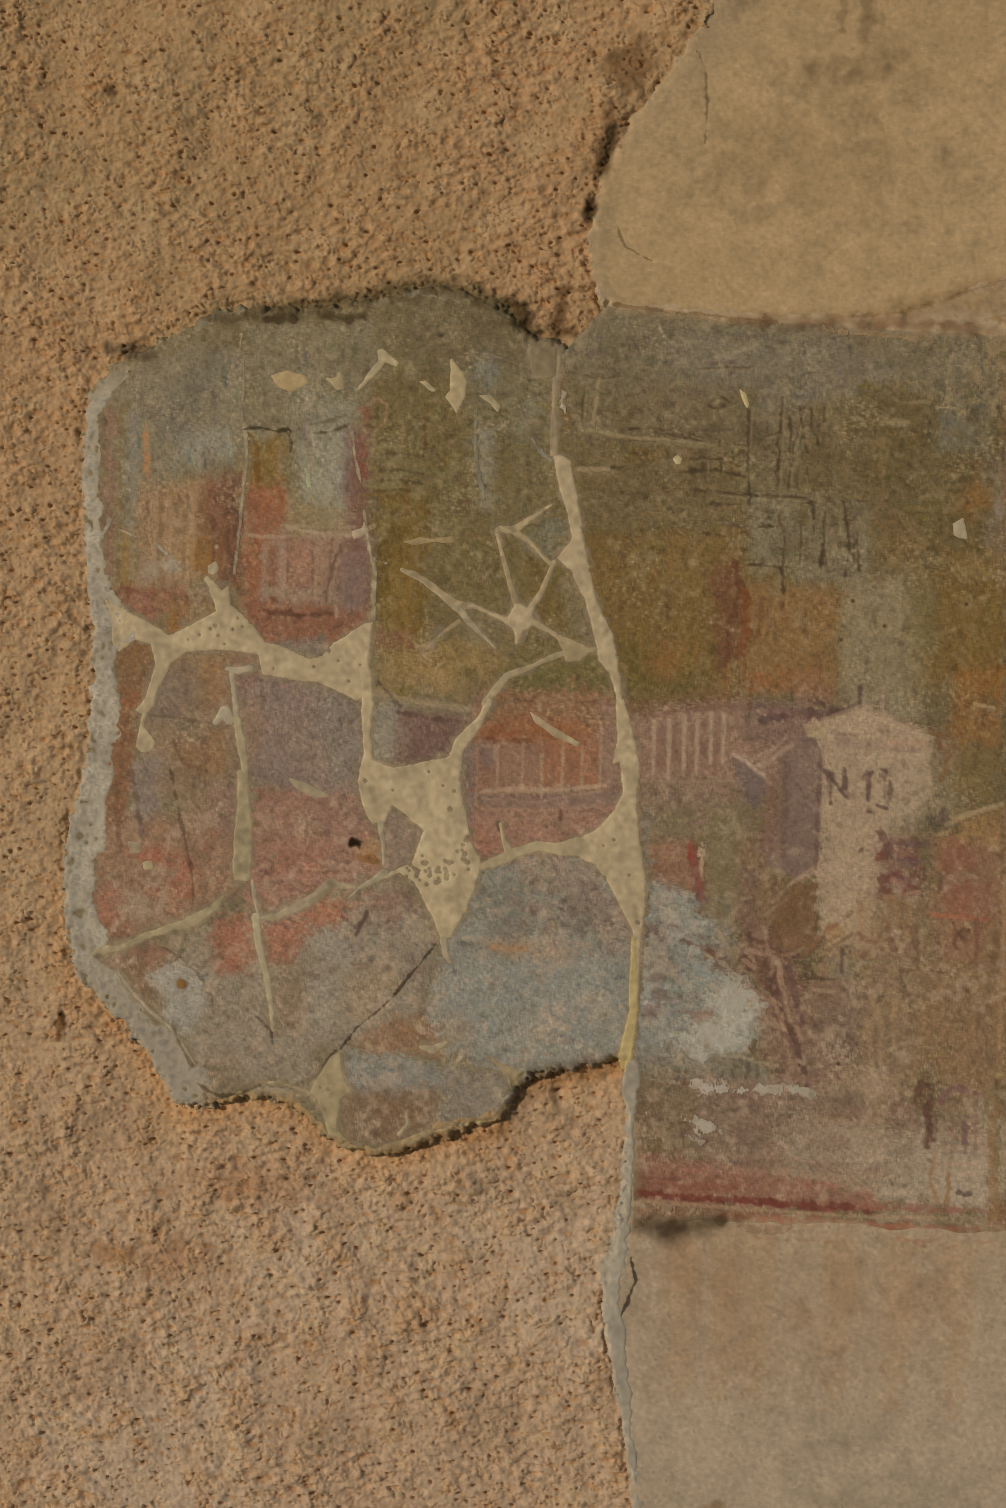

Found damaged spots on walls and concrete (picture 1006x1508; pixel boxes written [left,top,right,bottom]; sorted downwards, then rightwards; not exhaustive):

peeling [271,370,308,392]
peeling [326,349,398,390]
peeling [420,359,500,413]
crack [232,333,290,574]
crack [102,517,169,555]
crack [349,430,388,621]
crack [340,949,432,1049]